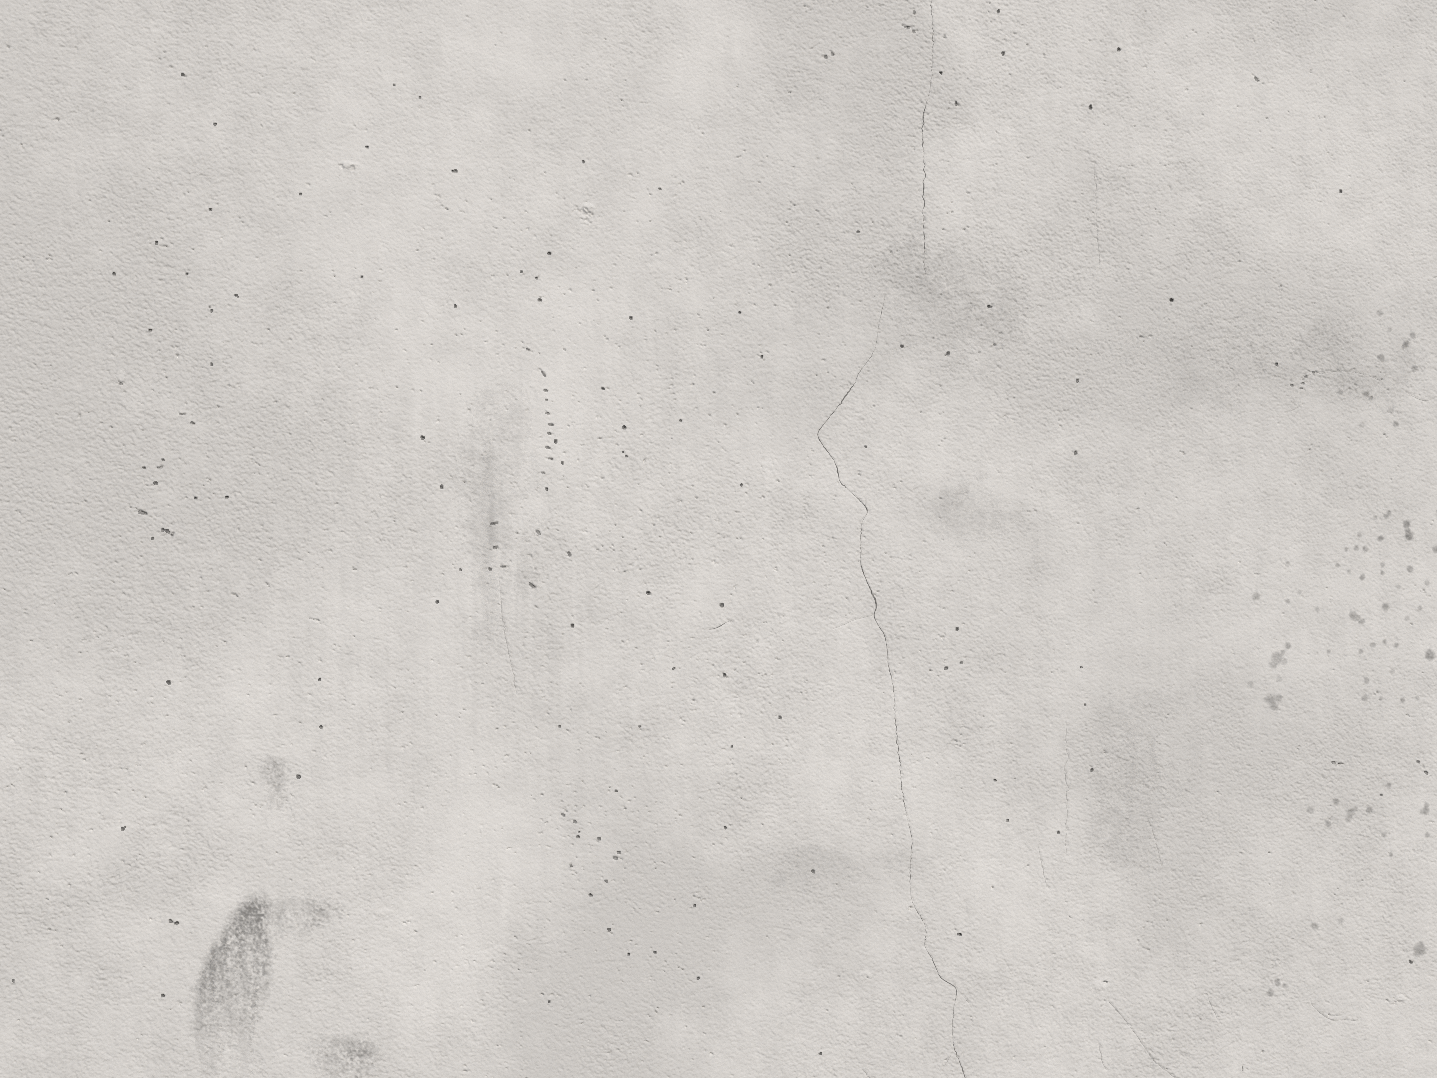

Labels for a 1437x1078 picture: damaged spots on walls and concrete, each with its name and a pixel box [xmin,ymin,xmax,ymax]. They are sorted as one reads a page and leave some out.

water stain [220,903,267,963]
crack [818,297,969,1077]